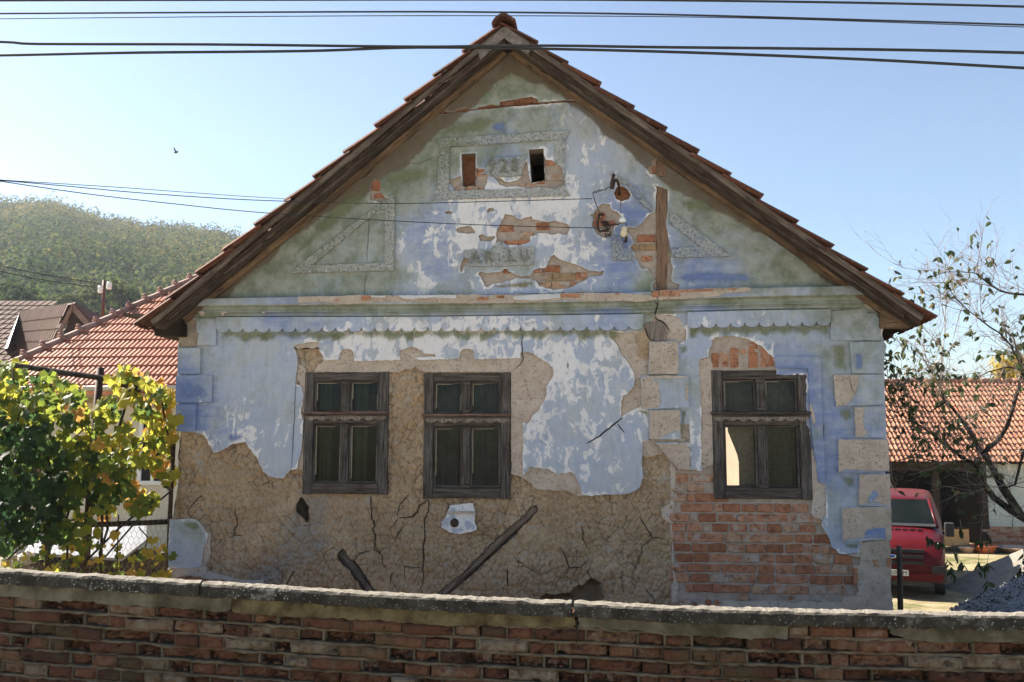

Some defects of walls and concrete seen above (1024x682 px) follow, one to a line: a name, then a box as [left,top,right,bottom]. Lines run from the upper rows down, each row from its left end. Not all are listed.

flaking render [298,157,751,305]
crack [588,418,625,443]
crack [355,494,429,592]
flaking render [0,315,893,678]
crack [507,527,591,587]
crack [634,517,663,604]